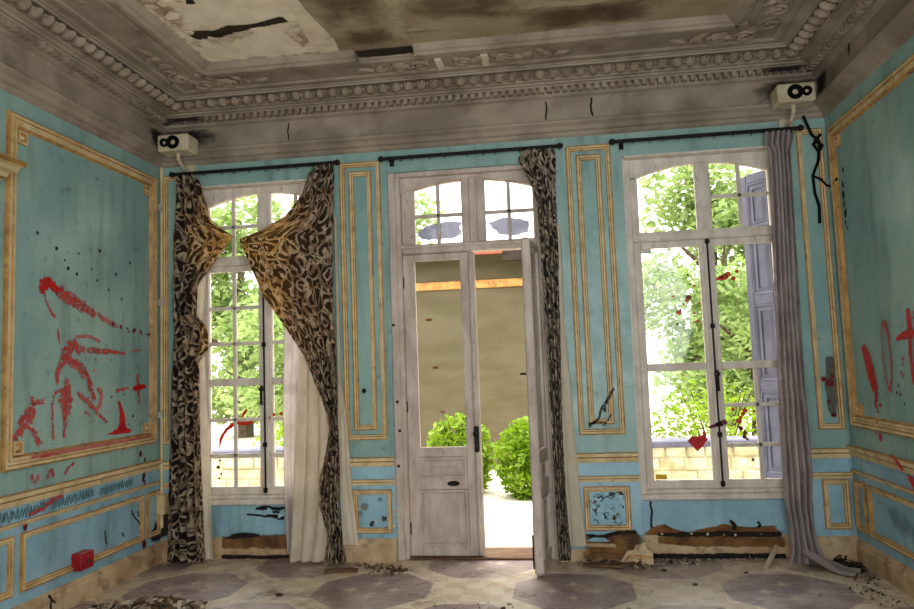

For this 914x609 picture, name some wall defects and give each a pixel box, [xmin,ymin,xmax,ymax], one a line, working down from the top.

spalling [140,0,339,63]
spalling [584,492,643,560]
spalling [653,531,787,559]